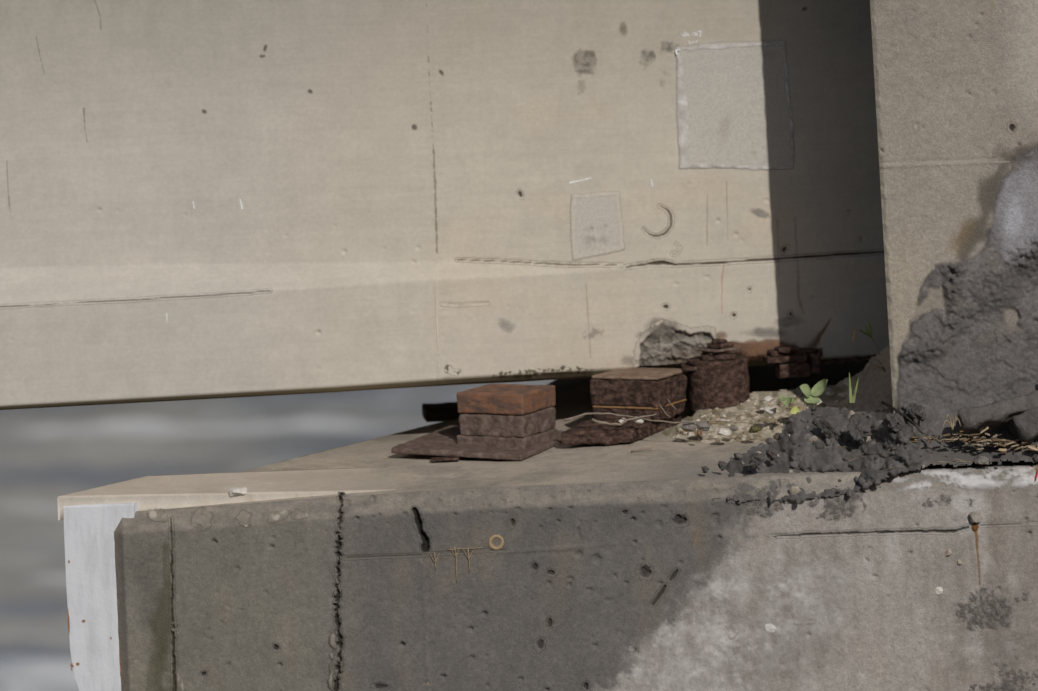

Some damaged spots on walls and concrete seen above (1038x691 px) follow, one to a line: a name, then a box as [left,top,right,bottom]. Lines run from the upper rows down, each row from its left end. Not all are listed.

damp [961,178,1002,257]
spalling [632,318,719,367]
crack [765,521,1038,540]
crack [327,492,508,691]